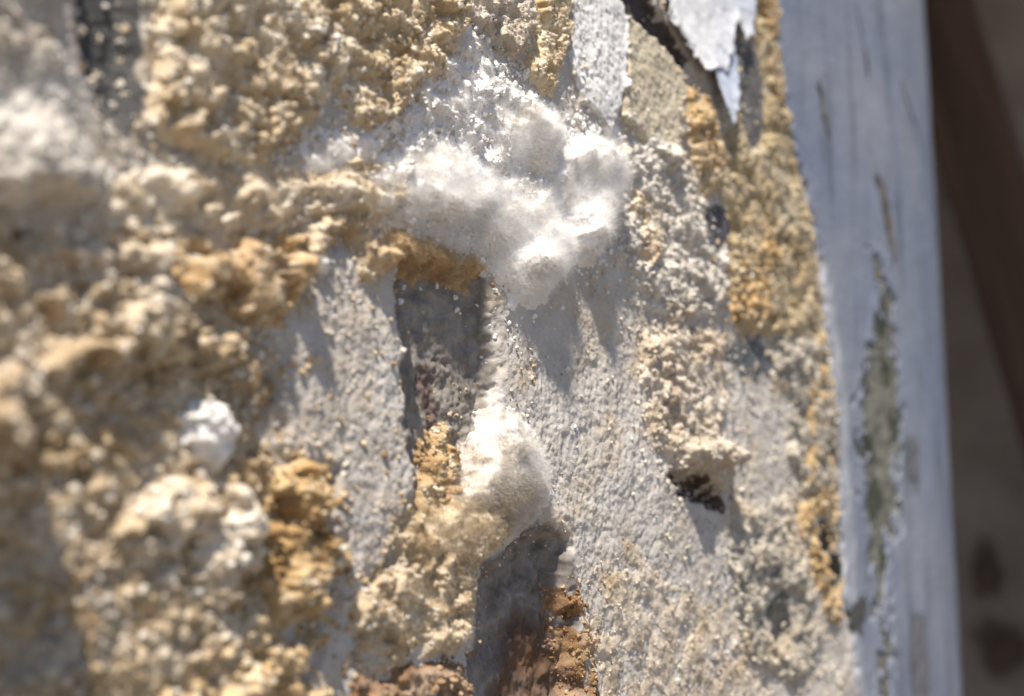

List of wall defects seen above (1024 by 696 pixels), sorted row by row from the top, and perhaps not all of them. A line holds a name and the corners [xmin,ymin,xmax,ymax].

peeling [668,0,757,126]
hole [667,472,725,514]
spalling [466,525,580,696]